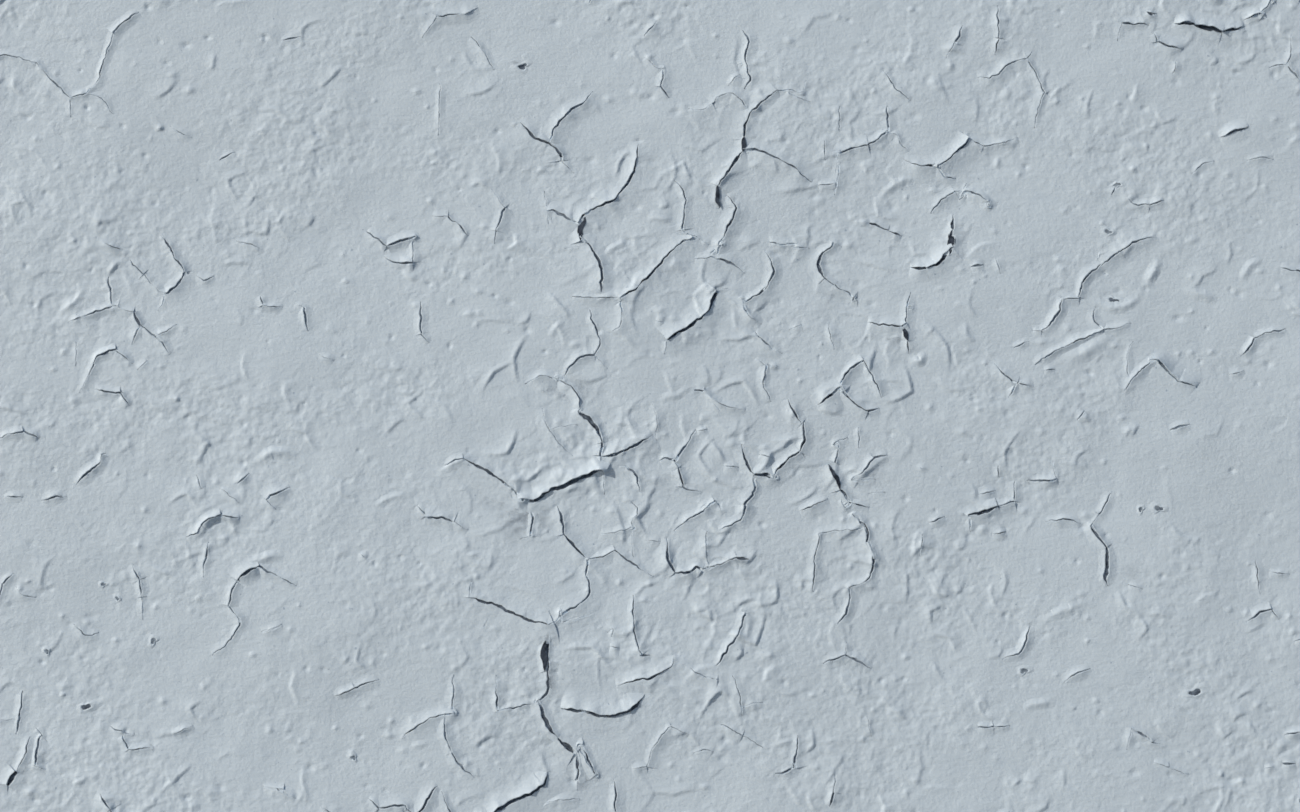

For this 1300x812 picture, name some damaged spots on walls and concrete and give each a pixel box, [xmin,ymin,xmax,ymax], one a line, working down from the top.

peeling [1113,0,1251,60]
peeling [831,105,1019,188]
peeling [655,78,815,364]
peeling [864,214,1006,368]
peeling [1012,180,1202,395]
peeling [657,384,746,420]
peeling [444,368,661,546]
peeling [412,503,469,535]
peeling [654,529,751,588]
peeling [556,655,793,777]
peeling [473,770,564,812]